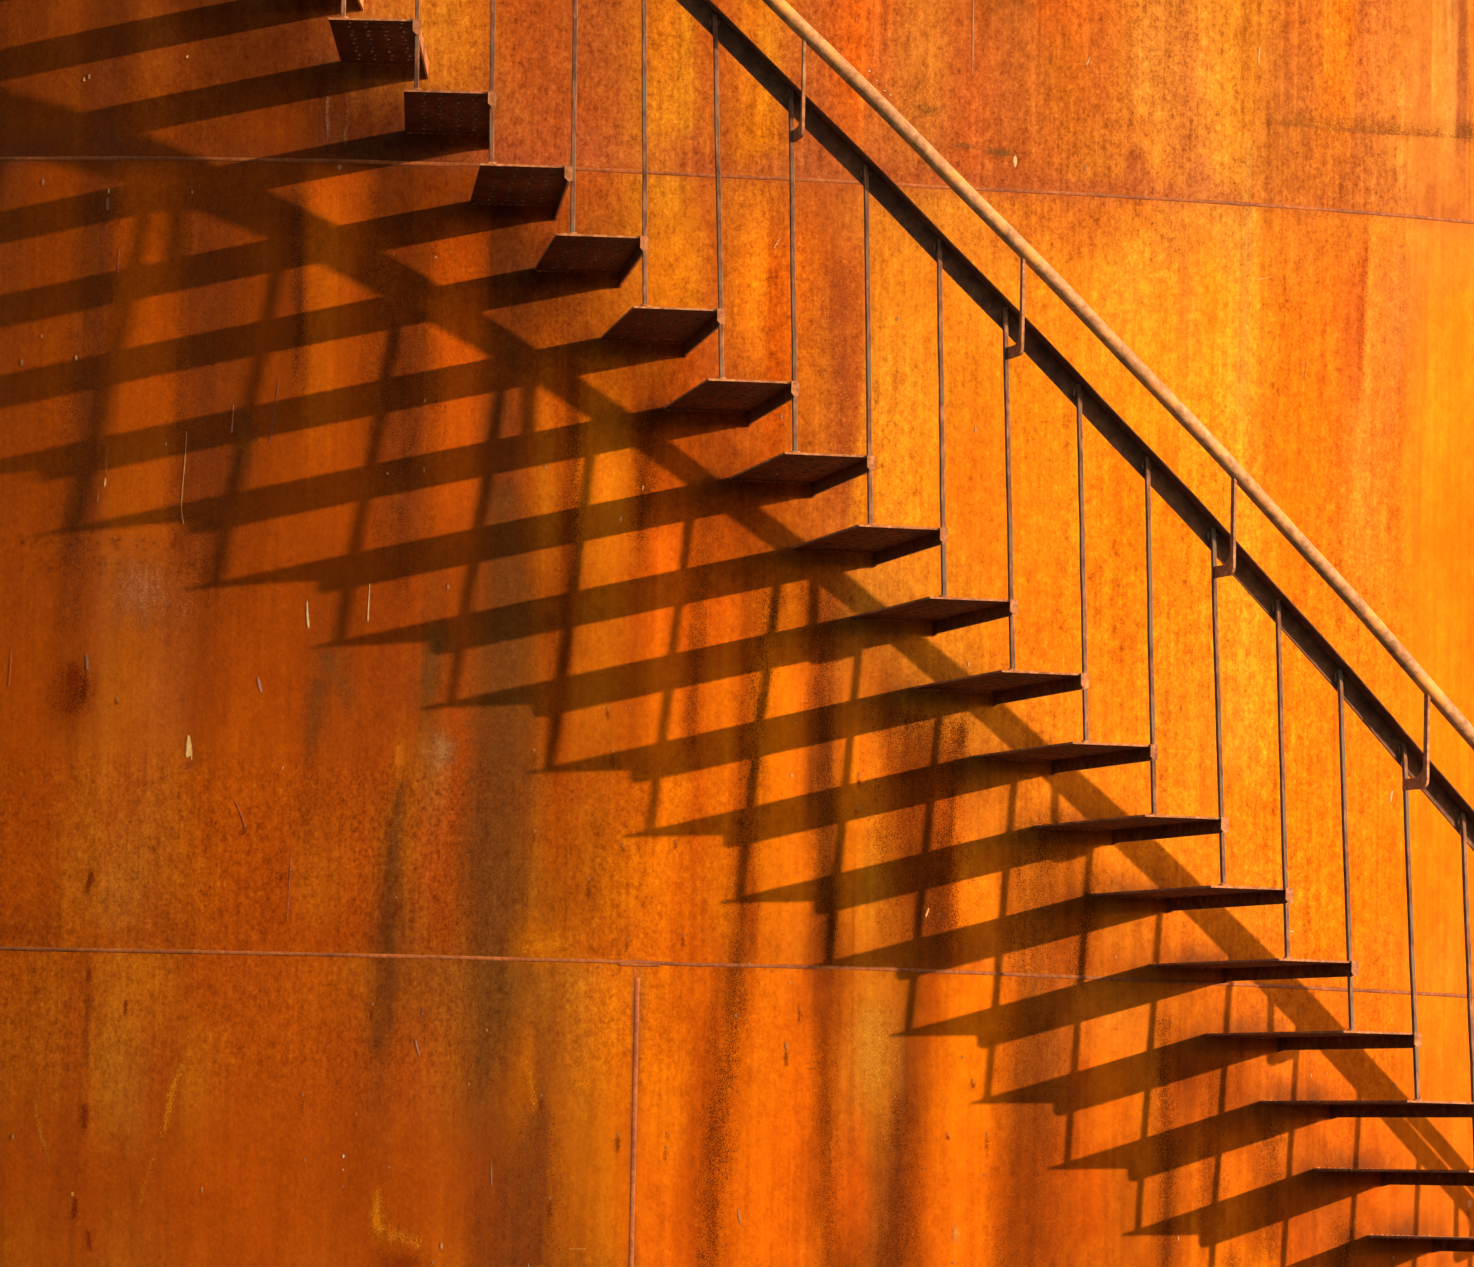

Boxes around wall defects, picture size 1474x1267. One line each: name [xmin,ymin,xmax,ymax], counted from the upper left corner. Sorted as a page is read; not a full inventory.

rust [1355,229,1373,406]